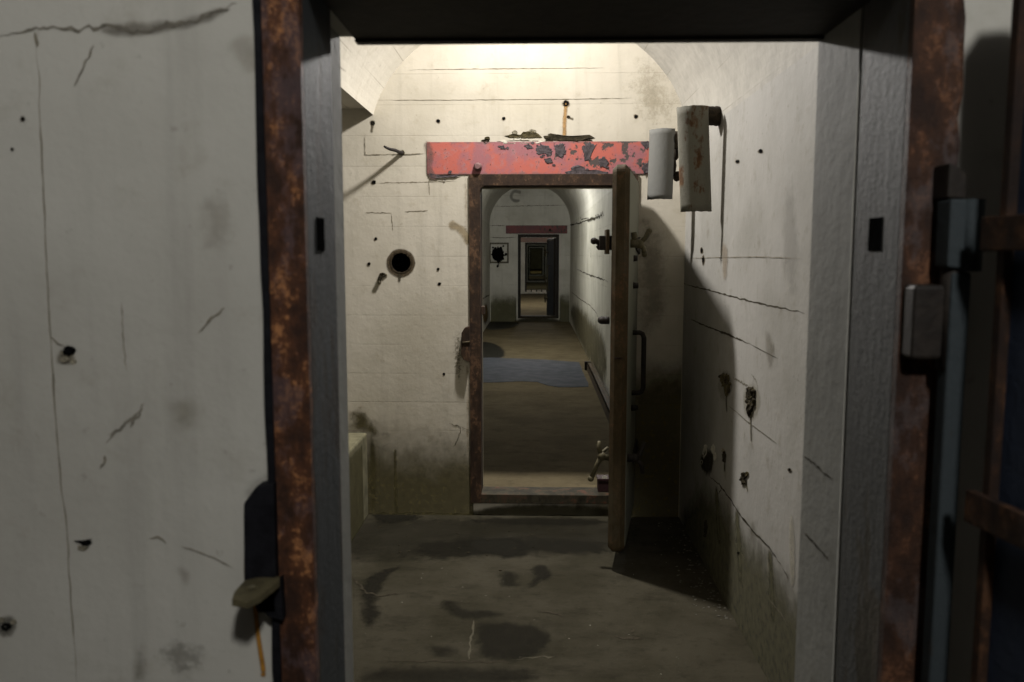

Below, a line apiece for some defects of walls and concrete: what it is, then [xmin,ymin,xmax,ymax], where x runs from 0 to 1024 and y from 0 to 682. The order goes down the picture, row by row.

spalling [481,129,611,174]
crack [0,3,237,682]
crack [691,319,778,359]
spalling [718,373,732,411]
spalling [745,386,756,440]
damp [349,413,608,542]
damp [421,539,599,557]
damp [631,373,797,682]
crack [710,477,788,578]
damp [362,568,395,625]
damp [369,601,549,682]